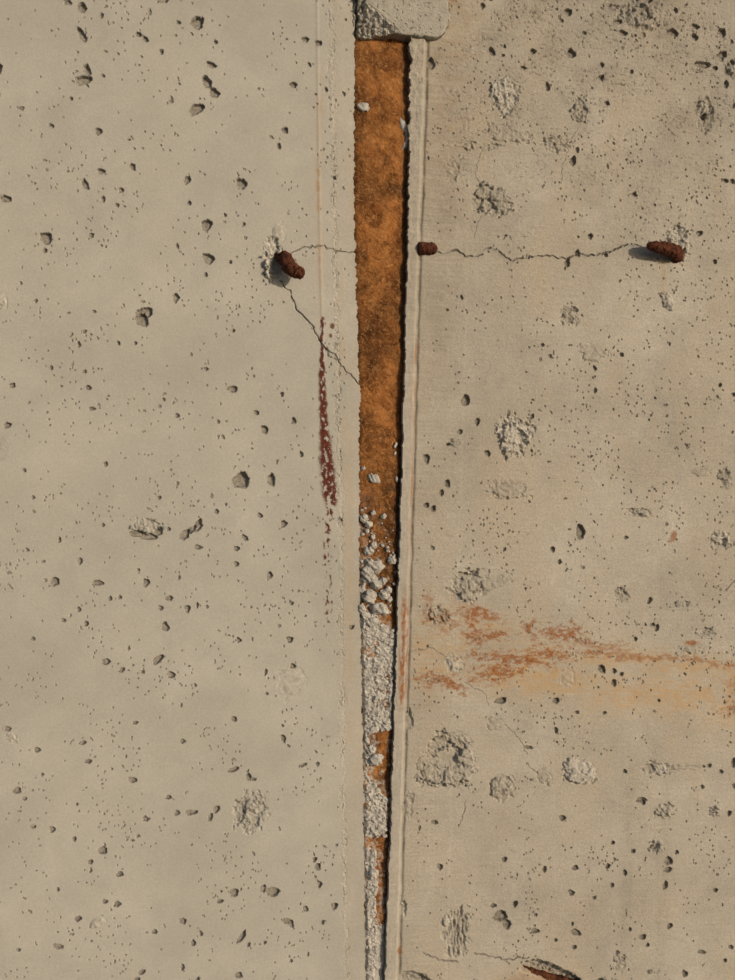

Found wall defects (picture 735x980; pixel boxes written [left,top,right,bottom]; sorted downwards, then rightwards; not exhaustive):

spalling [355,0,398,41]
rust [275,250,305,280]
crack [292,245,355,254]
rust [418,242,438,255]
crack [437,215,642,262]
rust [646,240,684,263]
crack [280,281,359,385]
rust [317,313,341,659]
rust [396,334,735,749]
spalling [400,970,433,980]
spalling [518,958,582,980]
spalling [595,950,628,980]